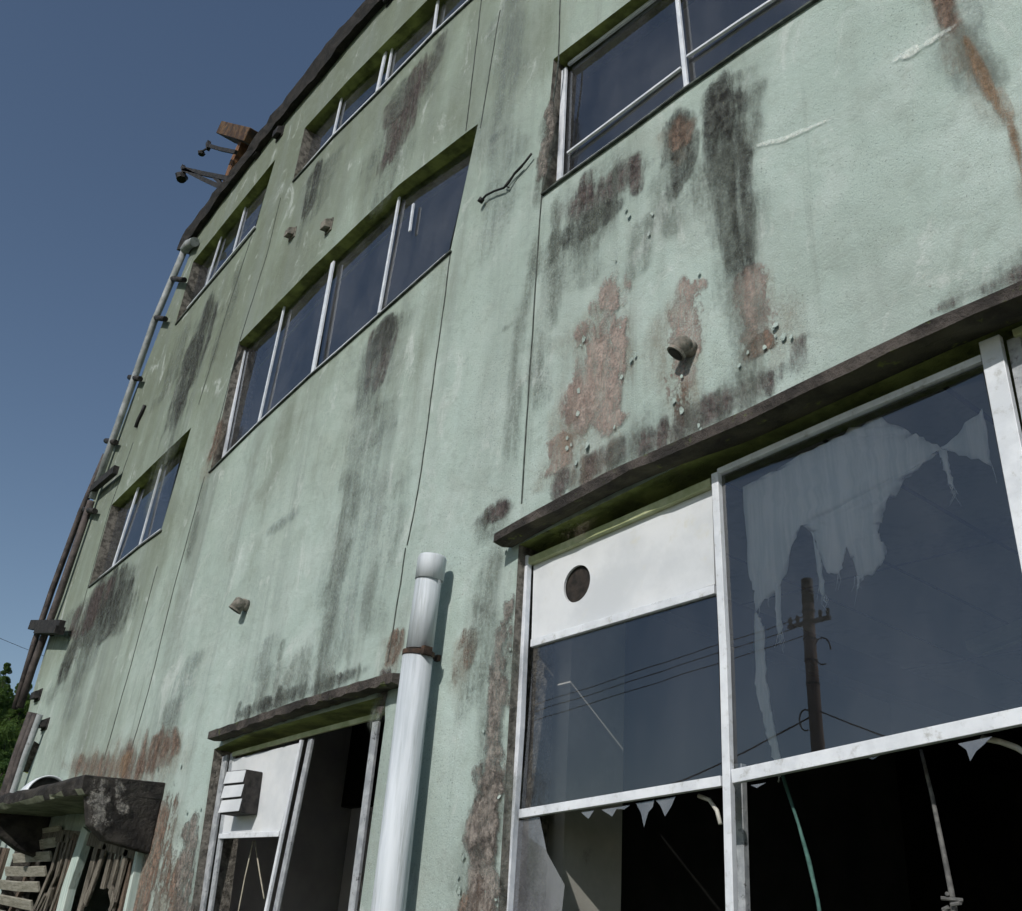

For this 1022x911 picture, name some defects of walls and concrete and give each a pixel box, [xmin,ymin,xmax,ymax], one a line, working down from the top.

damp [160,297,217,462]
damp [372,37,443,170]
peeling [544,276,636,477]
damp [548,154,643,318]
peeling [665,271,707,430]
damp [664,71,754,277]
peeling [734,263,793,368]
corrosion [932,0,1019,156]
damp [58,565,133,683]
spalling [86,778,130,833]
peeling [125,794,201,911]
spalling [455,594,514,911]